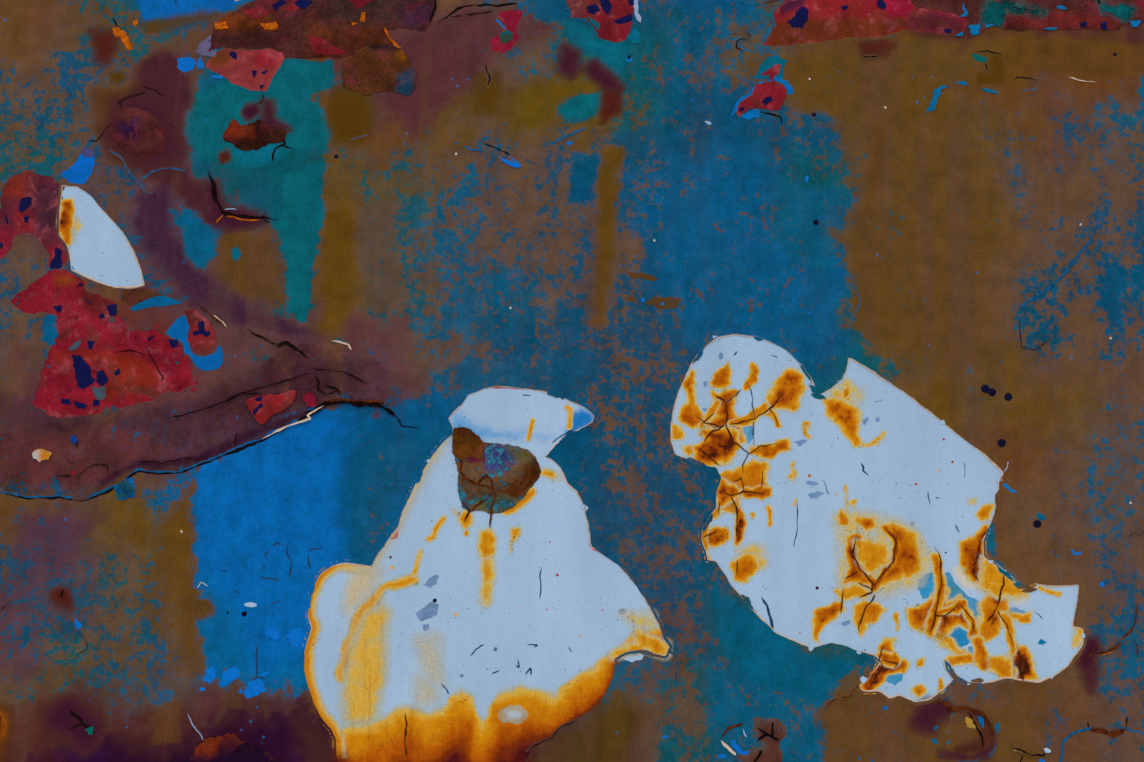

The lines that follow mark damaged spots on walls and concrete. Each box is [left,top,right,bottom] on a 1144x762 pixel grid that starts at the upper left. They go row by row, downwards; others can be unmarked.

peeling [177,36,288,95]
peeling [560,0,641,62]
peeling [0,148,223,421]
peeling [191,380,676,762]
corrosion [303,438,671,762]
corrosion [526,418,535,442]
corrosion [564,404,573,430]
corrosion [672,362,812,584]
corrosion [822,379,887,448]
peeling [664,328,1090,710]
corrosion [811,485,1062,734]
corrosion [42,695,106,755]